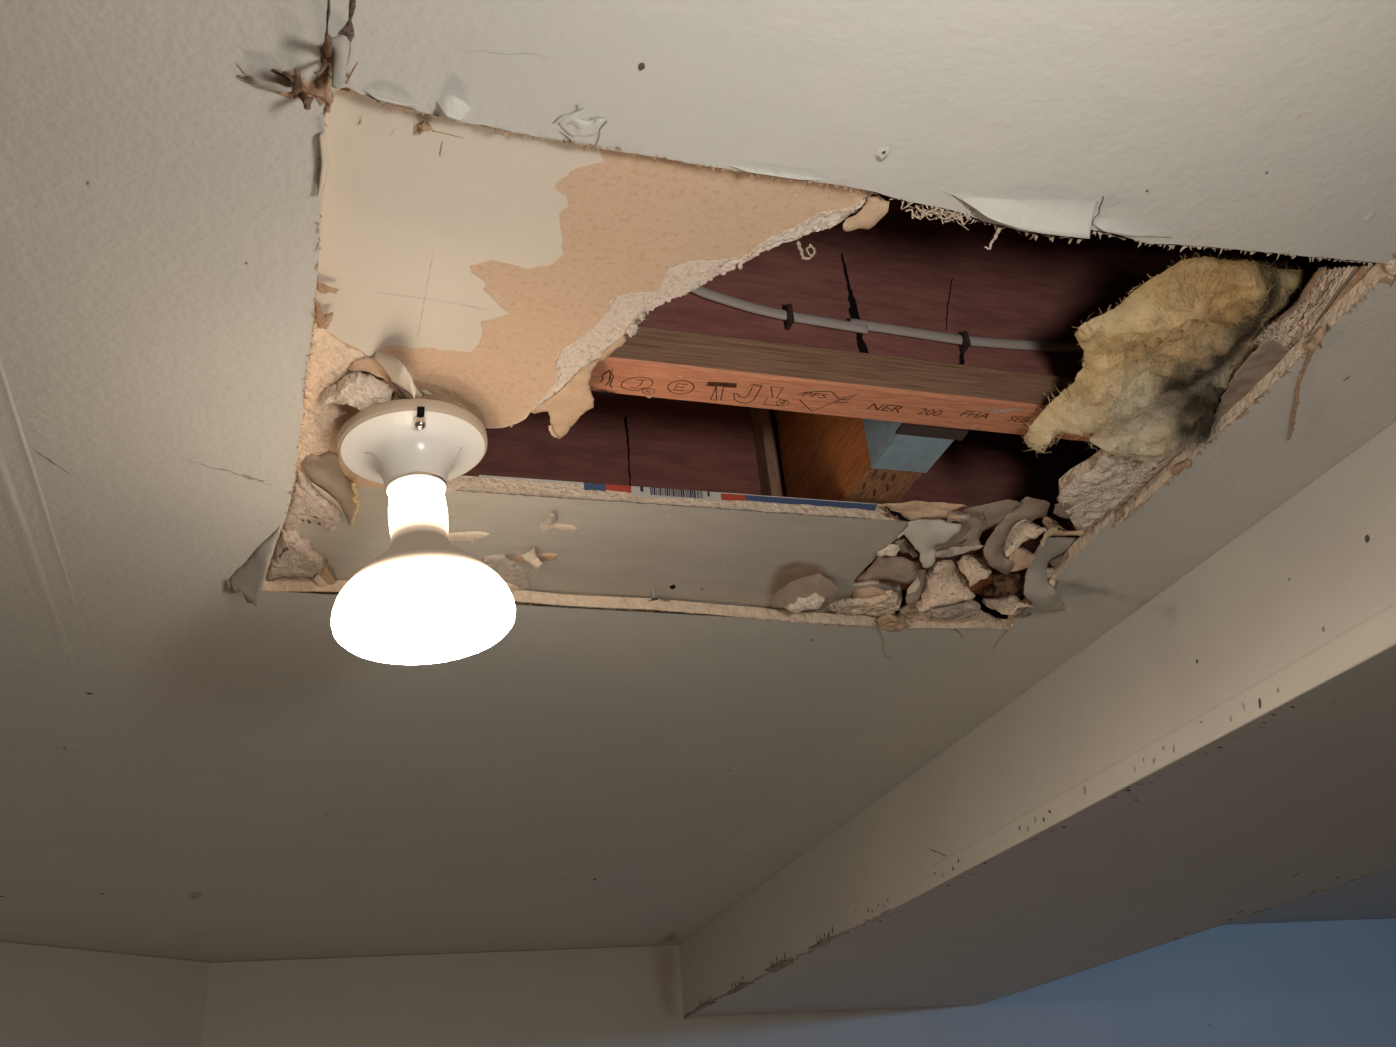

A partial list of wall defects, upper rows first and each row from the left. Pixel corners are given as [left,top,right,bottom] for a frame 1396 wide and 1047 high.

crack [235,0,358,113]
peeling [313,105,869,428]
crack [1288,272,1340,333]
crack [1385,254,1396,287]
peeling [318,403,385,488]
flaking render [1053,451,1169,530]
peeling [227,526,289,607]